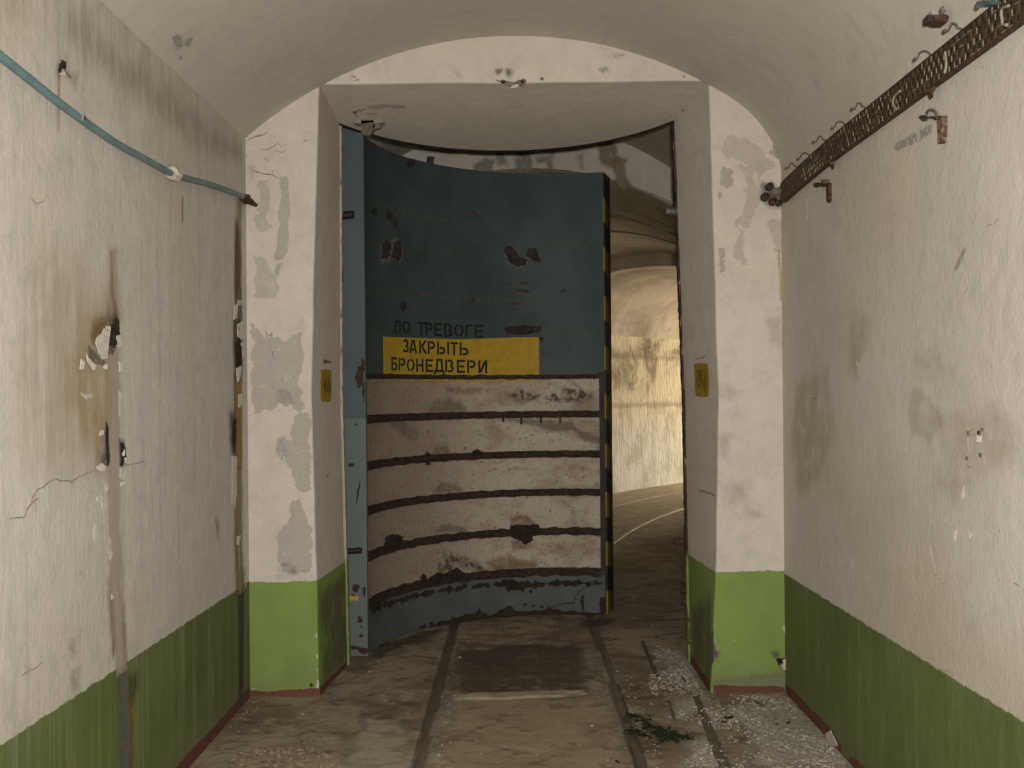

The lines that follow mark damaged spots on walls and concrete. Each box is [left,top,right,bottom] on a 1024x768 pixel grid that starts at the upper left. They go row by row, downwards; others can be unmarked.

flaking render [79,315,127,514]
crack [10,469,96,519]
corrosion [350,579,607,654]